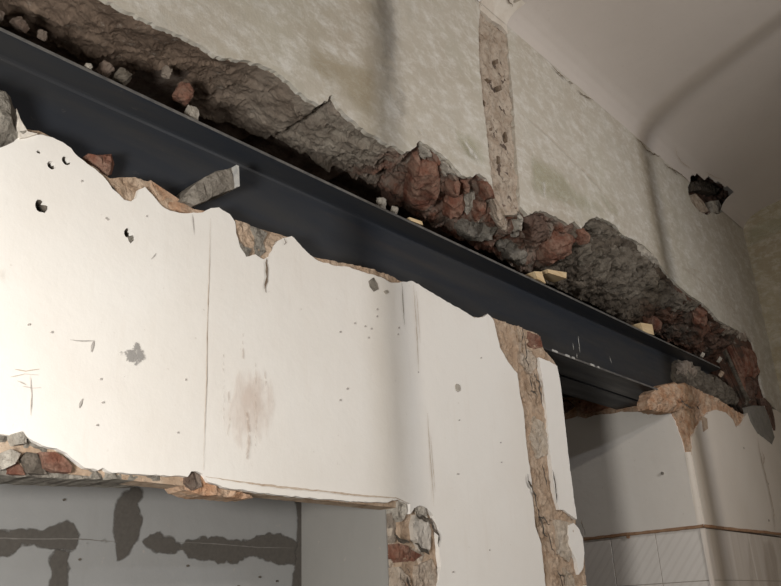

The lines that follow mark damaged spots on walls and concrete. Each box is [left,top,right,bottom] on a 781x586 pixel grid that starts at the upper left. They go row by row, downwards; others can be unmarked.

spalling [0,0,763,452]
spalling [0,431,160,488]
spalling [165,472,252,502]
flaking render [492,318,587,586]
spalling [386,501,440,586]